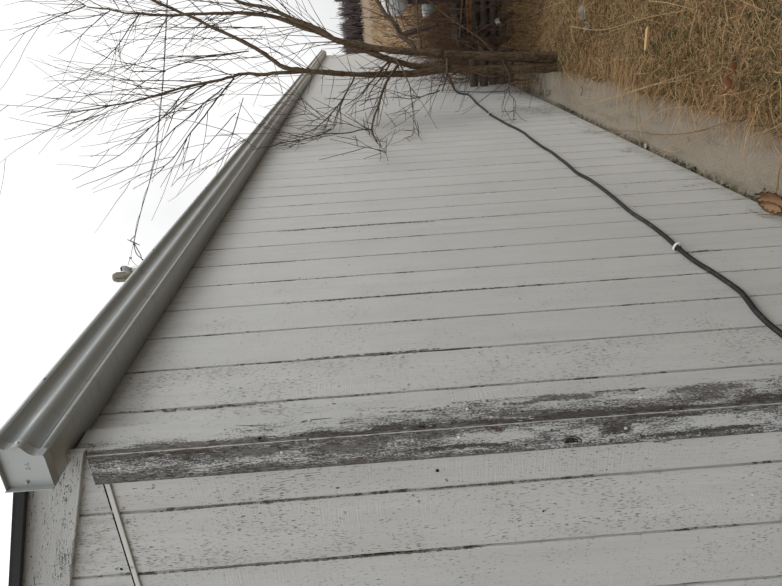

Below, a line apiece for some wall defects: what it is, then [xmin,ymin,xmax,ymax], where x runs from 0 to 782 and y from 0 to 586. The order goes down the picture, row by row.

peeling [503,387,645,405]
peeling [662,383,782,403]
peeling [119,404,763,462]